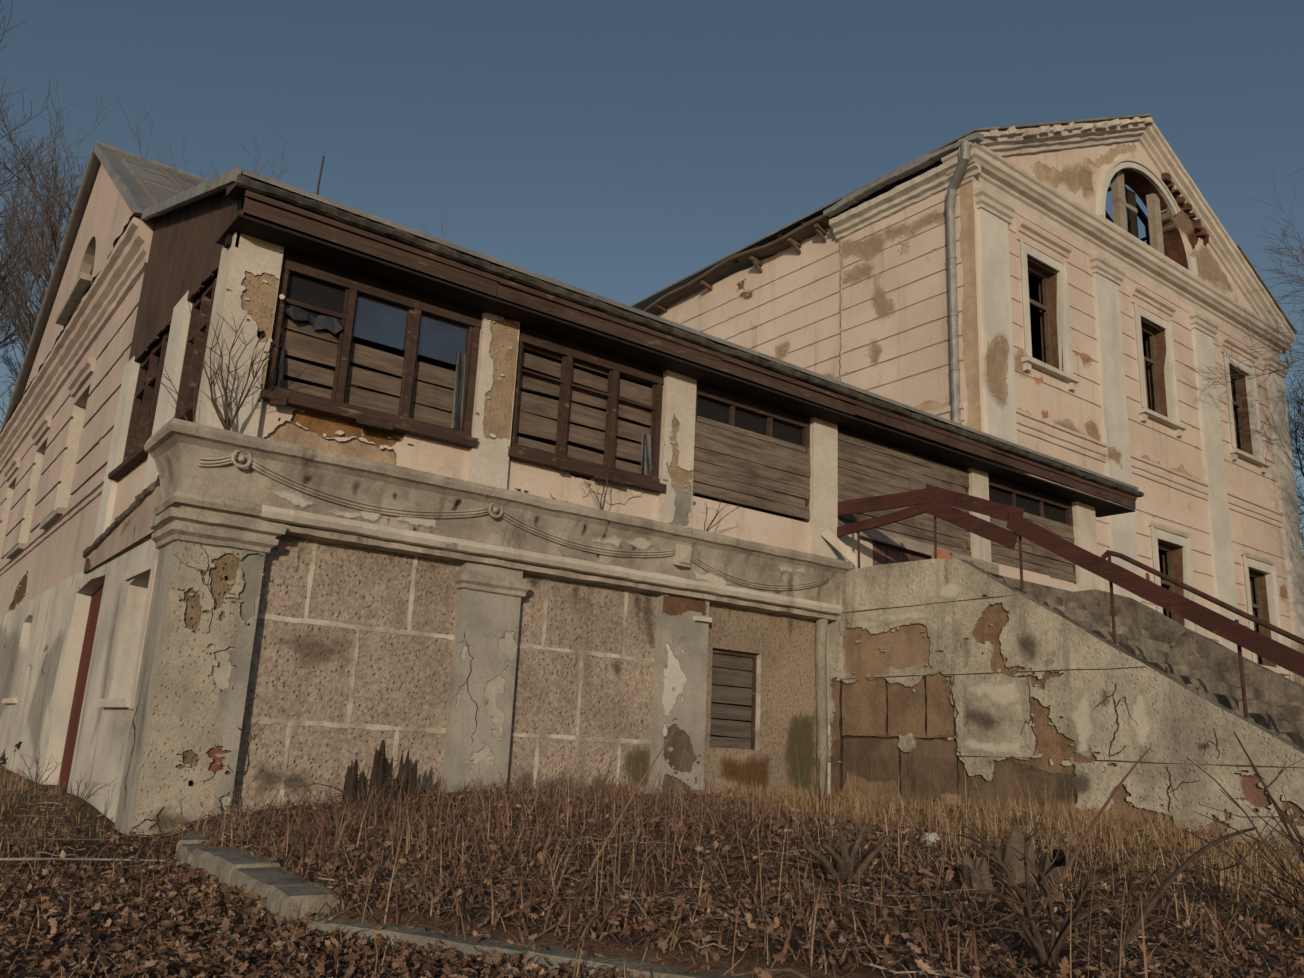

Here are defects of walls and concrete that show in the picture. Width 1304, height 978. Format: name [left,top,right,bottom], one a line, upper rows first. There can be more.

spalling [226,271,285,402]
spalling [263,409,414,465]
spalling [663,415,696,527]
peeling [986,336,1122,469]
spalling [8,570,28,612]
spalling [178,553,265,634]
spalling [175,745,232,775]
crack [453,634,478,741]
spalling [659,640,701,794]
spalling [828,594,1181,830]
crack [1092,682,1138,760]
spalling [1199,770,1304,836]